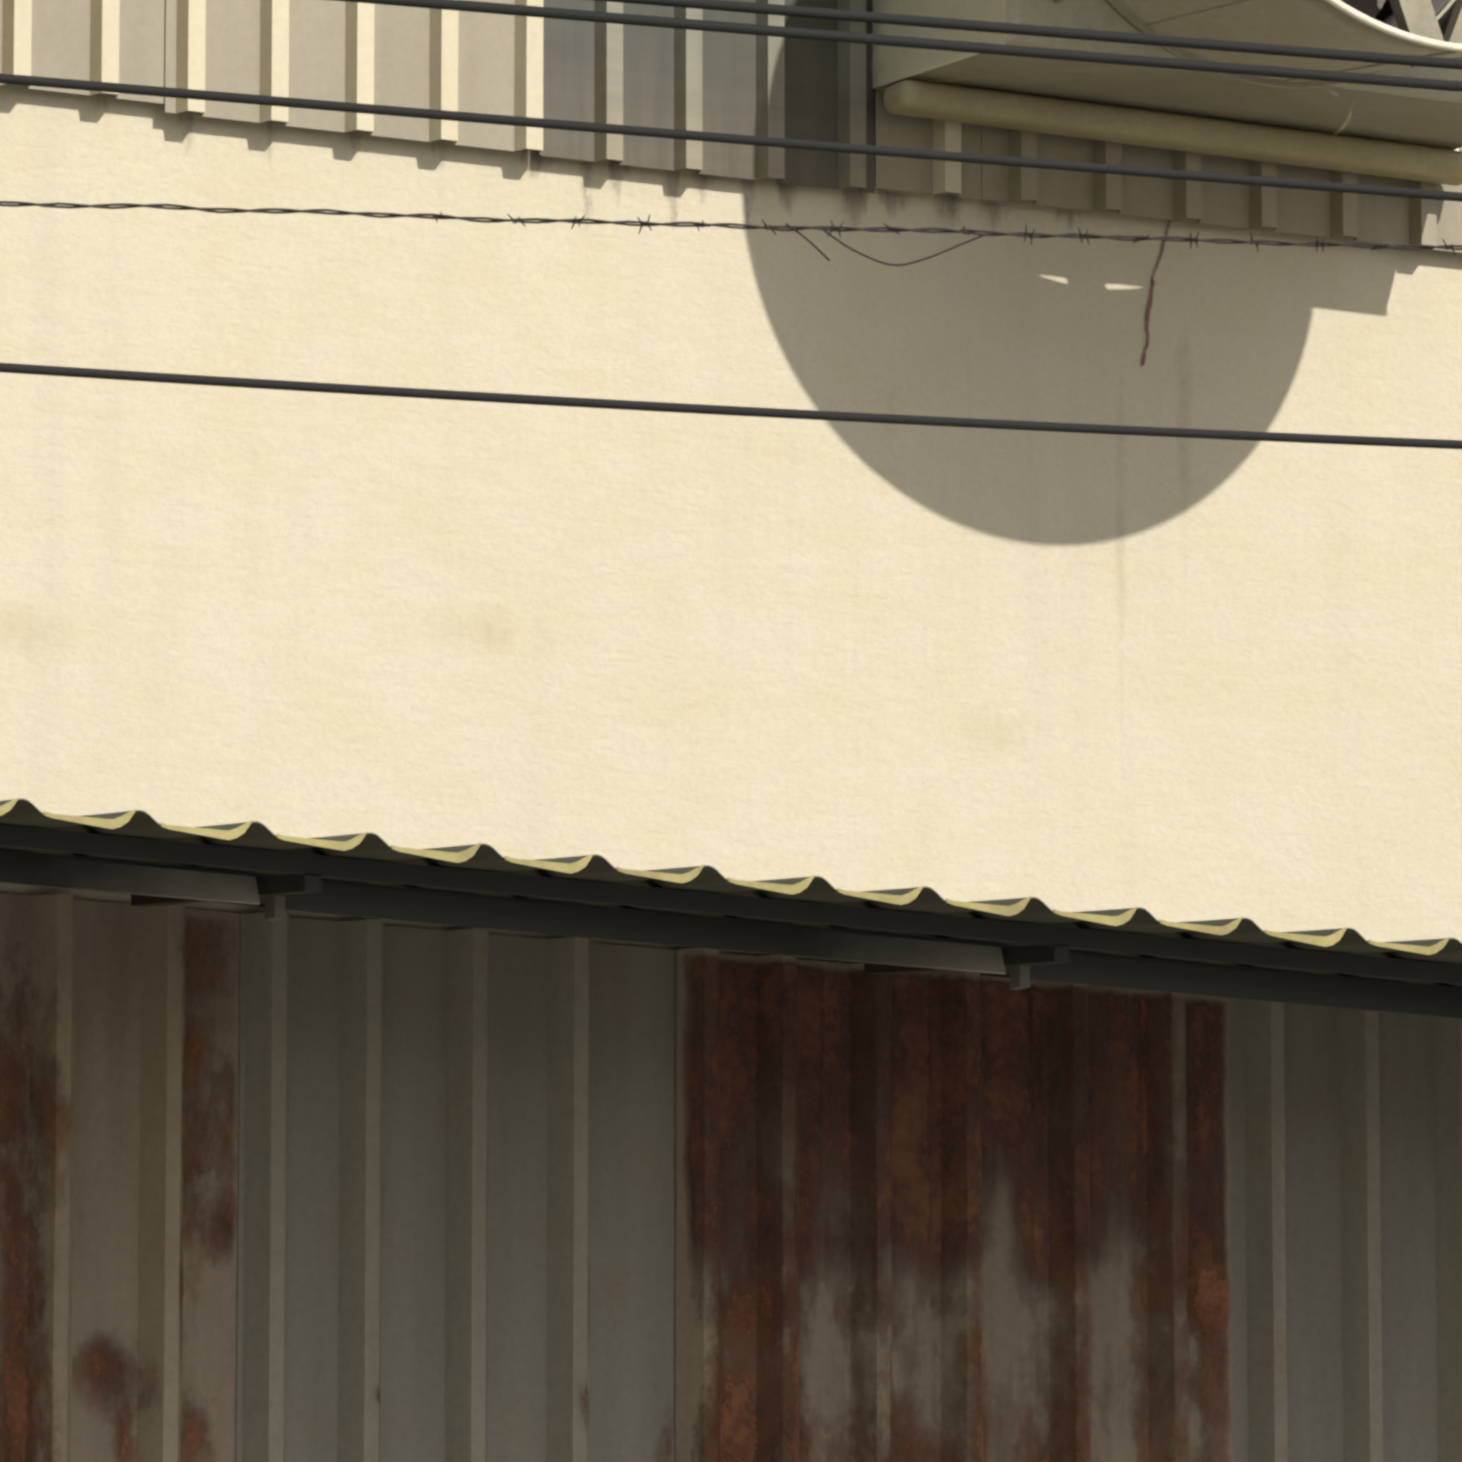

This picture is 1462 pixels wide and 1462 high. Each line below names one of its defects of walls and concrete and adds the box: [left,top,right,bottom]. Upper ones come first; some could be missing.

rust [1141,221,1170,366]
rust [685,956,1229,1462]
rust [79,1340,132,1462]